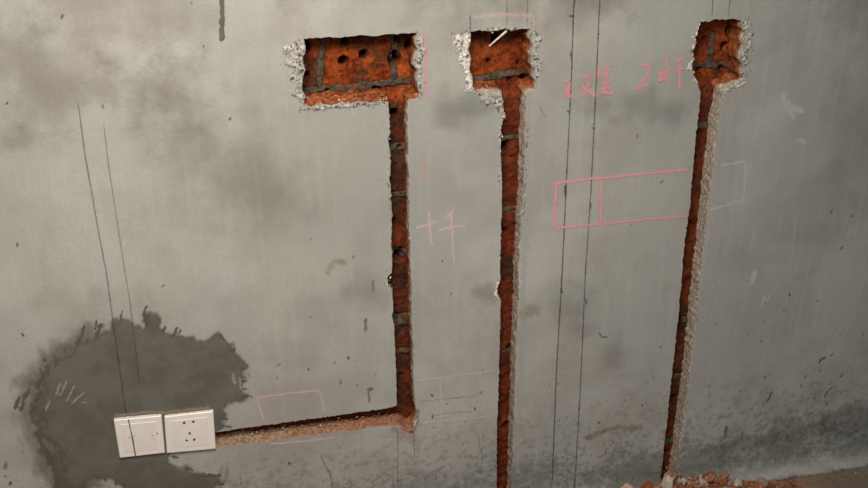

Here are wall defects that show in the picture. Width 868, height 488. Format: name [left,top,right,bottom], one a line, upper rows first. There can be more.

spalling [215,31,426,447]
spalling [445,23,544,488]
spalling [661,16,755,479]